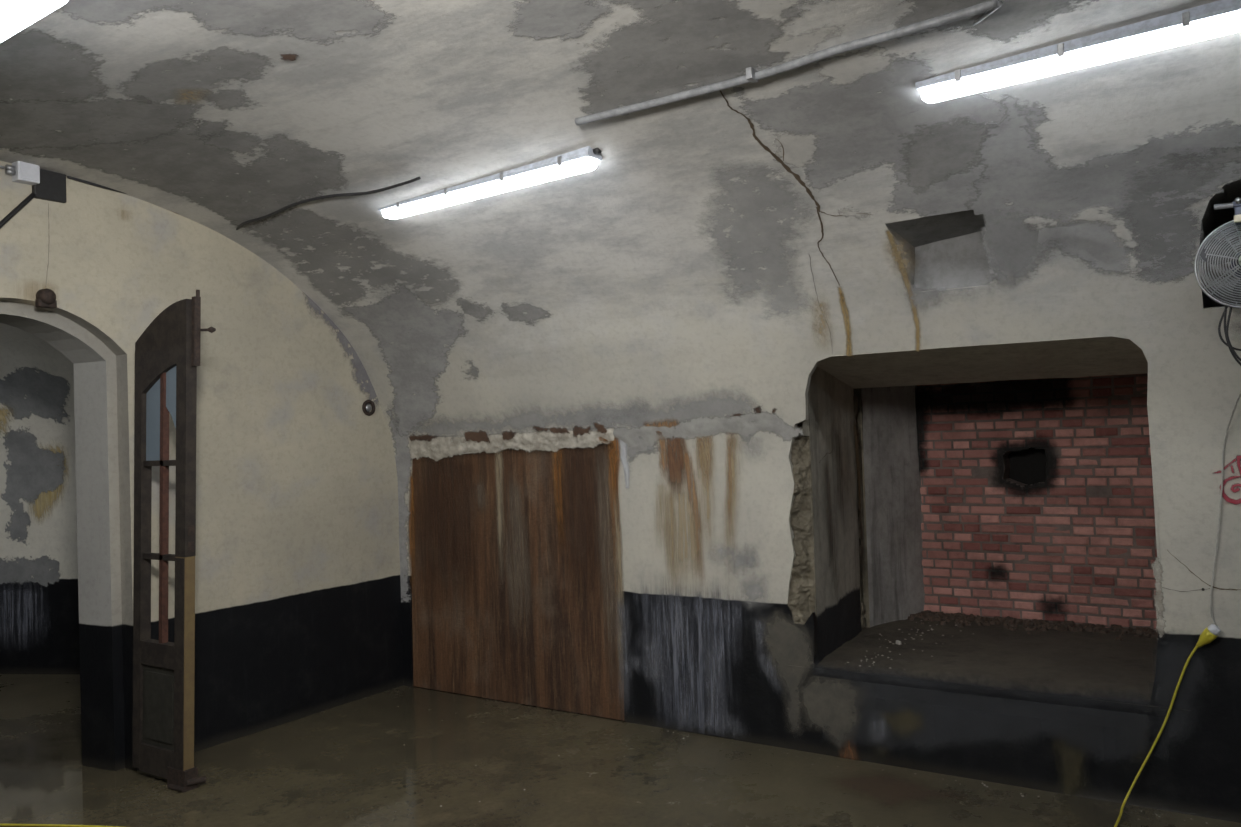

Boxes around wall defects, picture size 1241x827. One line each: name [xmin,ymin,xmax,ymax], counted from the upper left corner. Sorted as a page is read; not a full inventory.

peeling [59,0,394,45]
peeling [0,30,347,226]
crack [720,90,871,342]
peeling [508,0,1241,283]
water stain [0,589,42,639]
peeling [0,367,70,587]
rust [408,437,624,721]
water stain [619,593,741,733]
rust [659,436,712,561]
peeling [242,210,1151,762]
rust [727,438,735,521]
peeling [1151,557,1208,758]